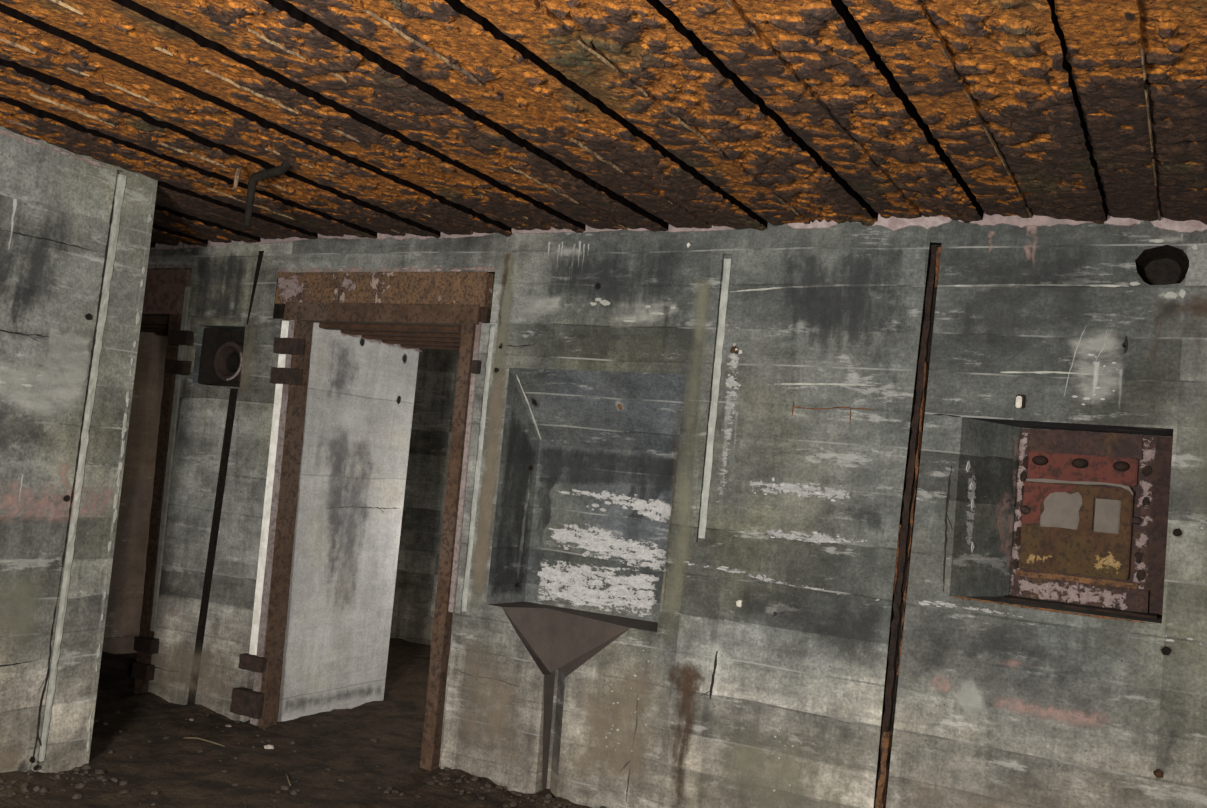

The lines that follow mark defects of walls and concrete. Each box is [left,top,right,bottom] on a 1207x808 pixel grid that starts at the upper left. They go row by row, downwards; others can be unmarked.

water stain [332,465,365,563]
peeling [535,489,671,618]
corrosion [893,361,928,675]
corrosion [1020,456,1029,496]
corrosion [670,666,701,796]
corrosion [875,731,892,808]